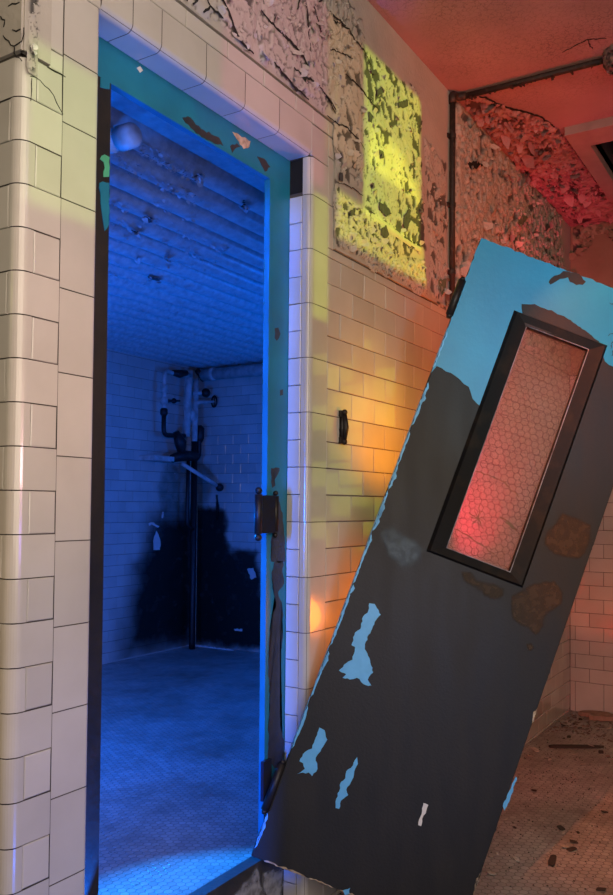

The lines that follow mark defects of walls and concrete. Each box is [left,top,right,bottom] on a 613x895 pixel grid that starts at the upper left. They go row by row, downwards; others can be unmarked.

crack [0,2,65,114]
peeling [182,0,613,311]